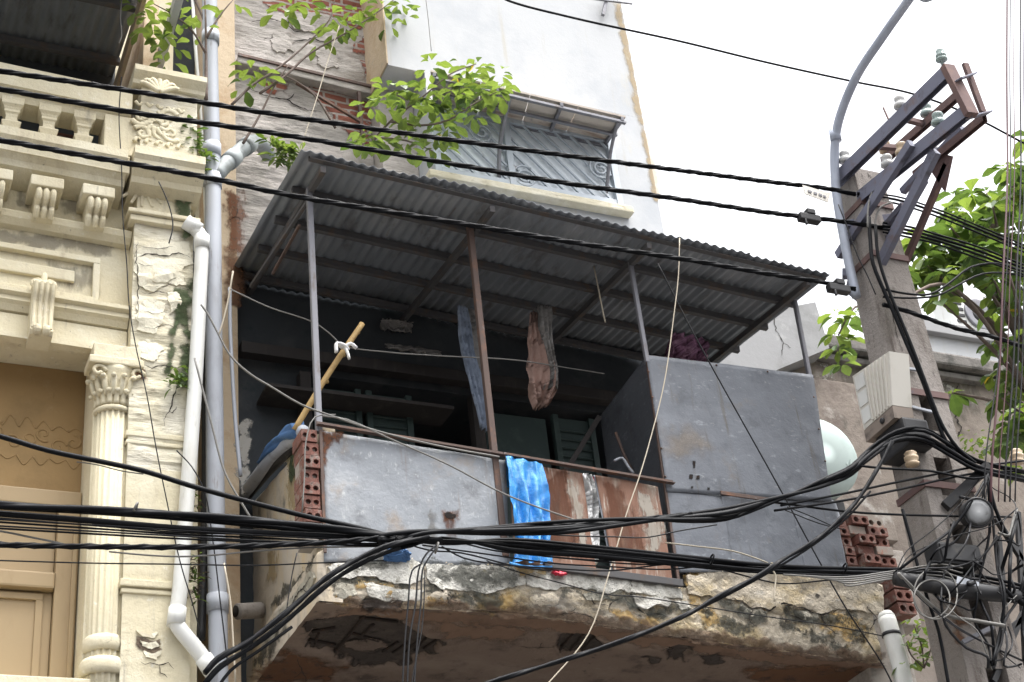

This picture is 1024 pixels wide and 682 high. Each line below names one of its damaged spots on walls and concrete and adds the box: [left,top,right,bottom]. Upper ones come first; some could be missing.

flaking render [263,0,367,75]
flaking render [265,81,289,95]
flaking render [309,86,372,144]
flaking render [133,240,194,362]
rust [547,469,583,520]
rust [550,532,586,544]
rust [604,482,665,551]
spalling [136,630,162,660]
flaking render [262,571,316,646]
flaking render [302,557,884,667]